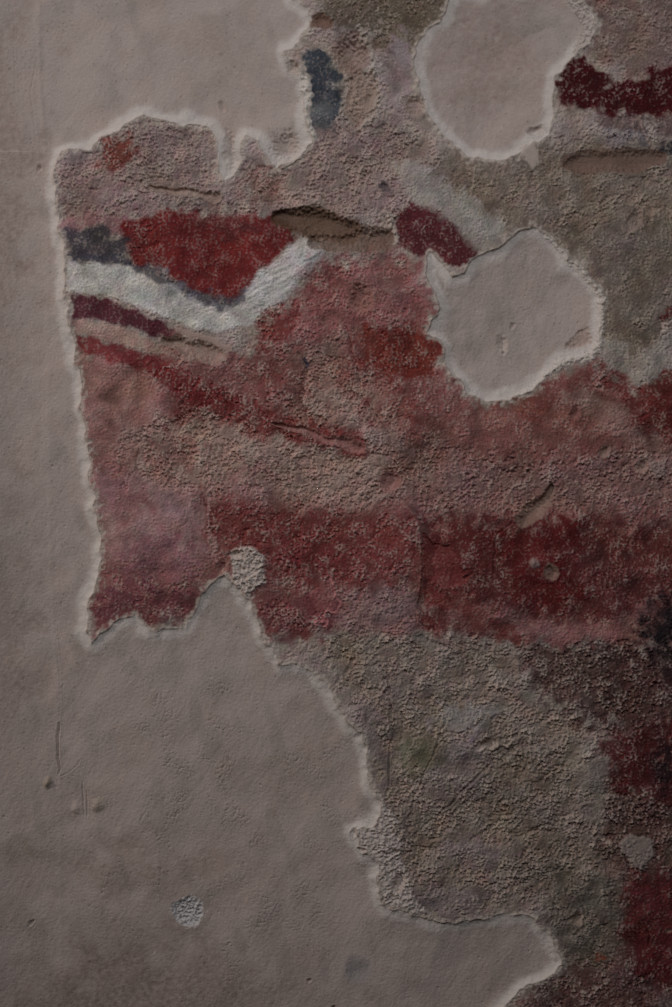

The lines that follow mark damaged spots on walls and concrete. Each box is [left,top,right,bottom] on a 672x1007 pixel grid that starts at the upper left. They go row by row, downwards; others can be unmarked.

spalling [564,0,597,58]
spalling [60,70,429,257]
spalling [558,144,669,177]
spalling [160,326,232,368]
spalling [513,233,610,398]
spalling [123,371,385,512]
spalling [514,481,556,529]
spalling [224,545,268,598]
spalling [516,634,661,737]
spalling [349,801,432,917]
spalling [596,799,672,875]
peeling [168,892,206,929]